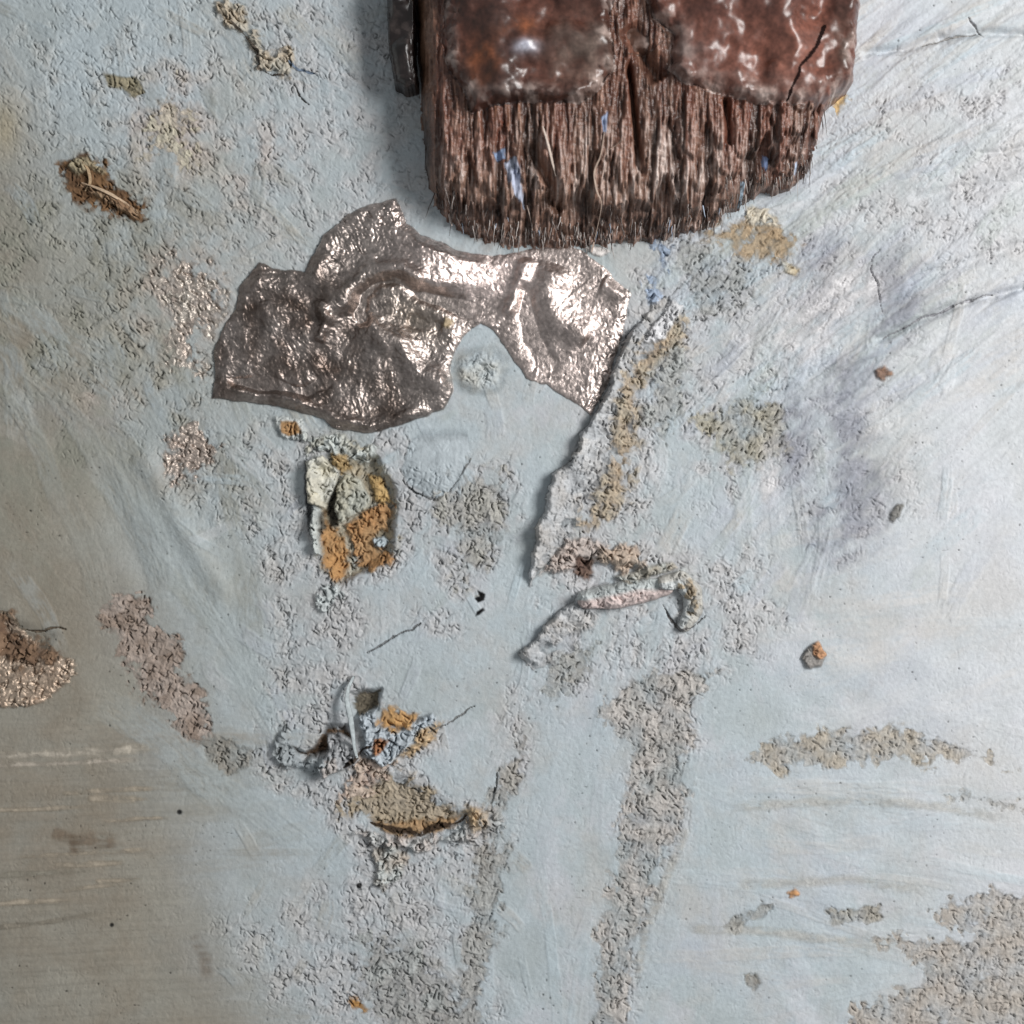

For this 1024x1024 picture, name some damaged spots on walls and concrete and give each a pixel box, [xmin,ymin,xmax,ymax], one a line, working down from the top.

spalling [56,152,147,222]
spalling [274,416,402,612]
peeling [540,537,703,632]
peeling [98,591,253,775]
peeling [272,726,398,804]
peeling [750,725,994,778]
peeling [589,667,719,1024]
peeling [825,905,882,925]
peeling [848,884,1024,1024]